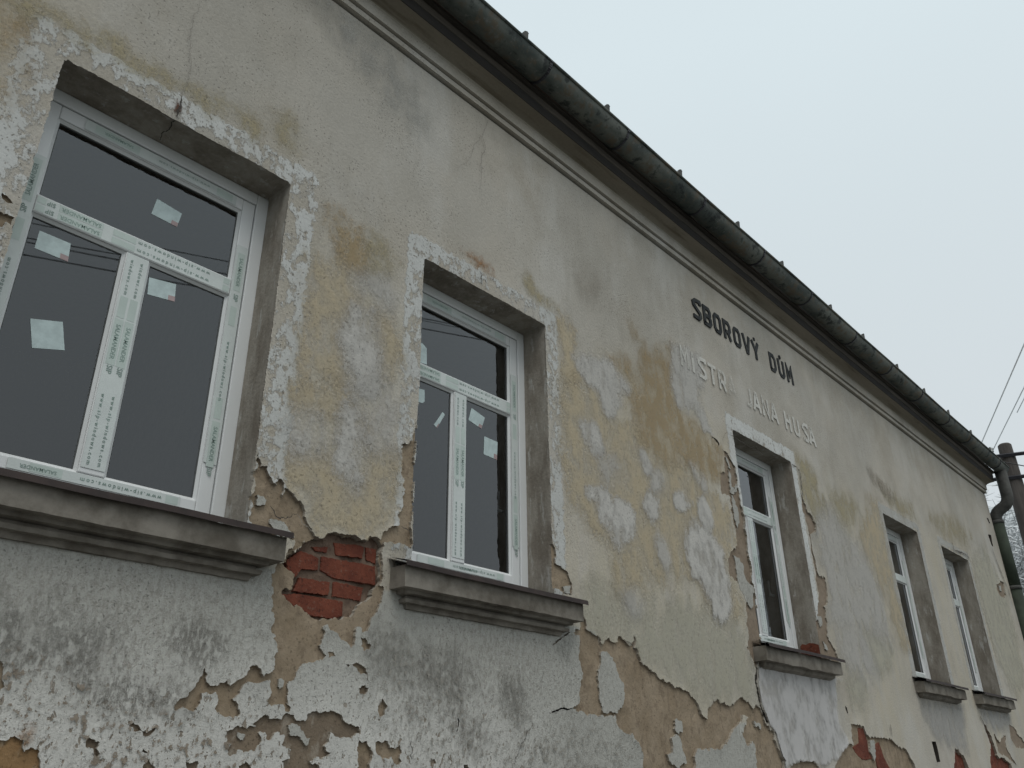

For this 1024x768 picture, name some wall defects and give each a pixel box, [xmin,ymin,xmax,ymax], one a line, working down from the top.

crack [160,1,200,140]
peeling [0,13,819,768]
water stain [285,419,402,538]
flaking render [835,706,916,768]